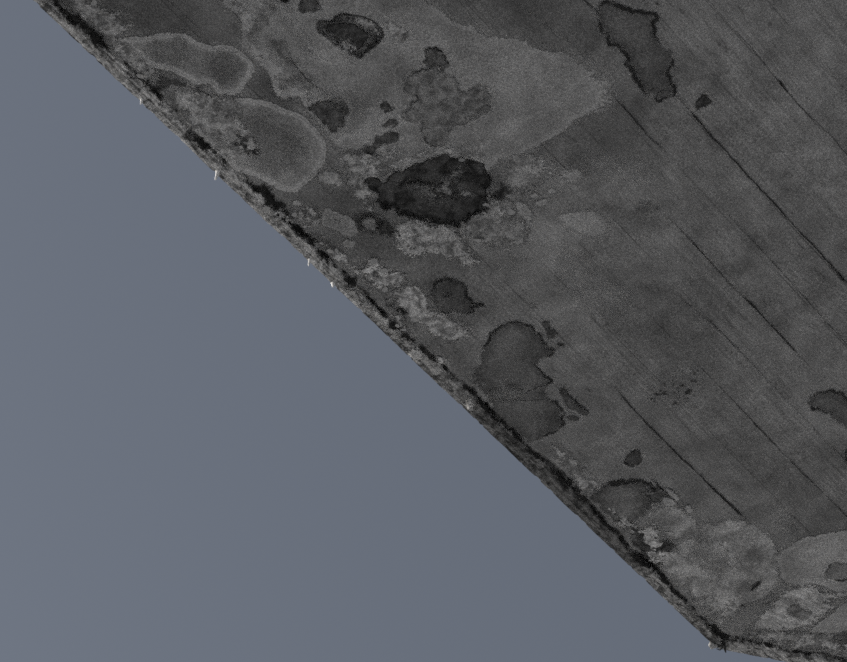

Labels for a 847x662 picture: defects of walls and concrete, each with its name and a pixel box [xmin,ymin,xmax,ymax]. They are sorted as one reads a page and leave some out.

water stain [52,0,111,54]
water stain [597,0,676,102]
water stain [118,0,617,461]
water stain [807,389,847,428]
water stain [549,445,847,662]